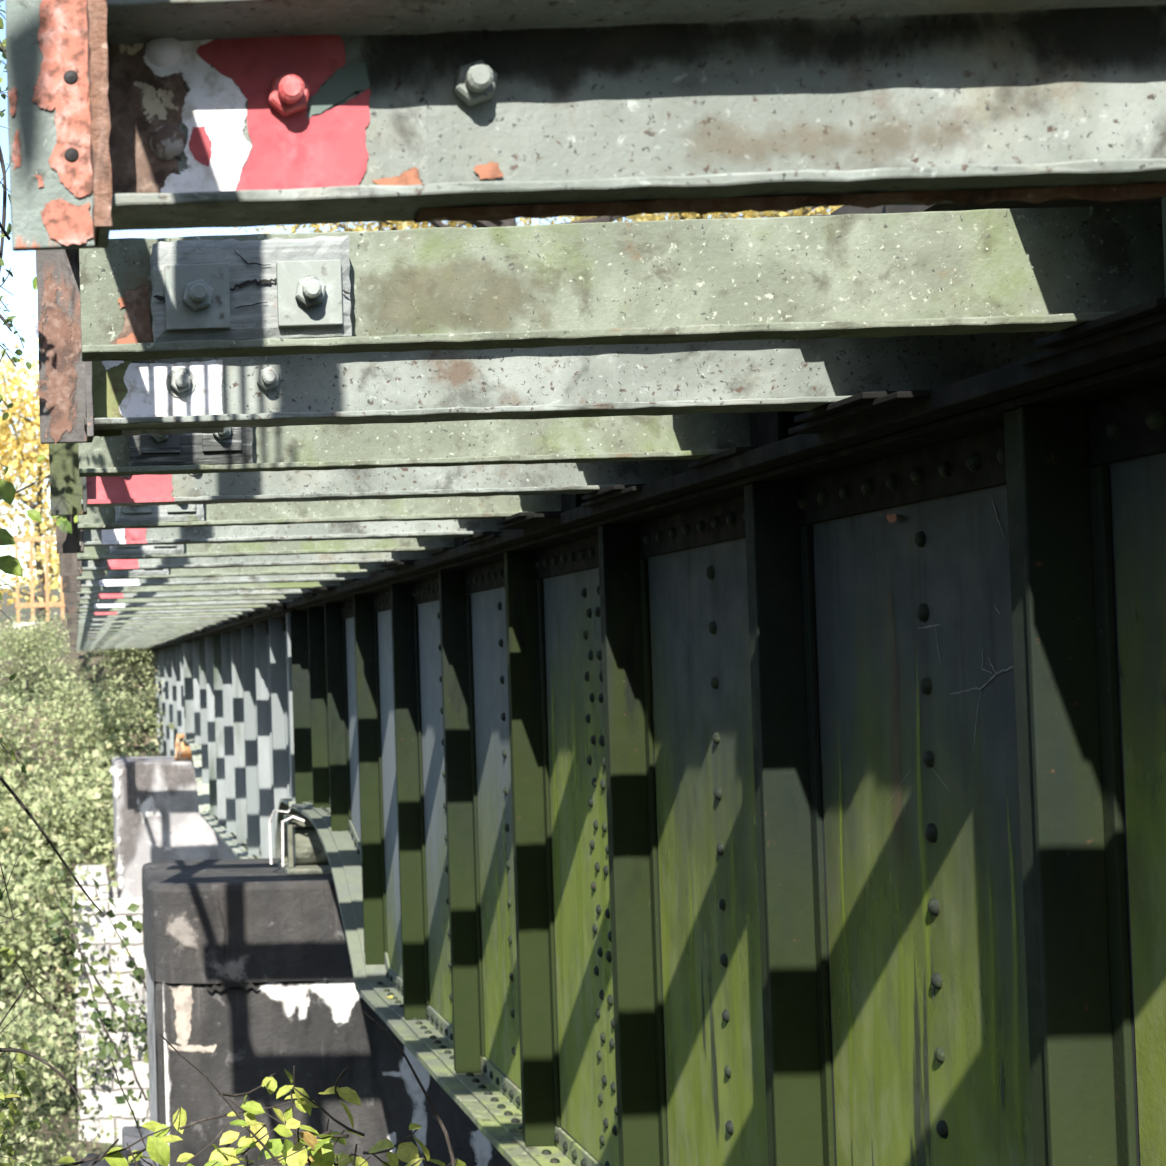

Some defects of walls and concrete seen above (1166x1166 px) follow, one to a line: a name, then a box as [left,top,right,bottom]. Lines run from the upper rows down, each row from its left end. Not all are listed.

peeling [118,40,252,193]
rust [373,167,423,185]
rust [473,162,503,179]
rust [110,285,153,345]
crack [230,250,277,309]
rust [31,272,81,445]
peeling [92,361,132,437]
crack [950,651,1014,749]
leakage [897,707,934,1166]
spalling [168,983,217,1053]
leakage [690,887,719,1145]